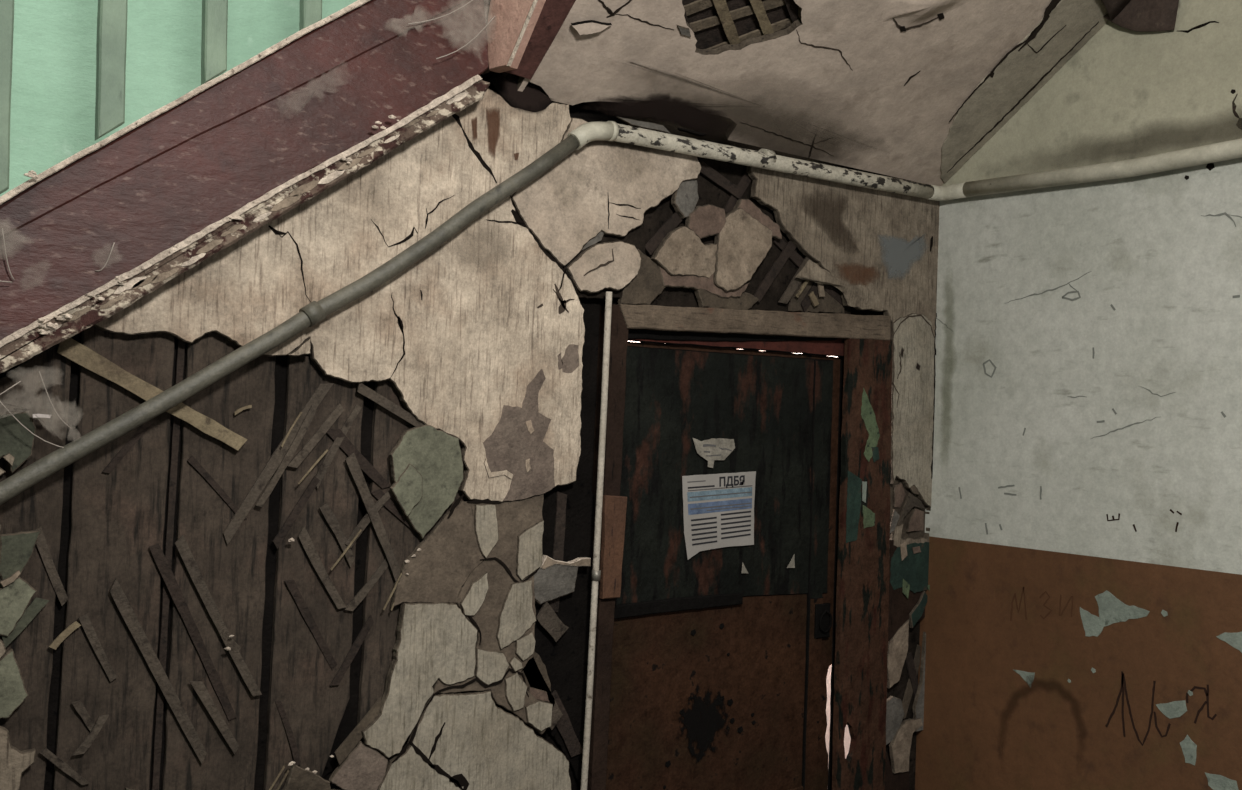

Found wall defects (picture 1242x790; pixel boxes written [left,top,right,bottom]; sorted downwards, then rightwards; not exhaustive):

crack [598,0,674,30]
spalling [677,0,800,49]
crack [796,29,853,71]
crack [947,0,1099,173]
peeling [113,158,362,294]
crack [452,114,588,314]
spalling [563,157,851,314]
spalling [0,307,240,482]
spalling [0,337,595,790]
crack [480,557,540,582]
spalling [885,479,930,790]
crack [392,668,529,790]